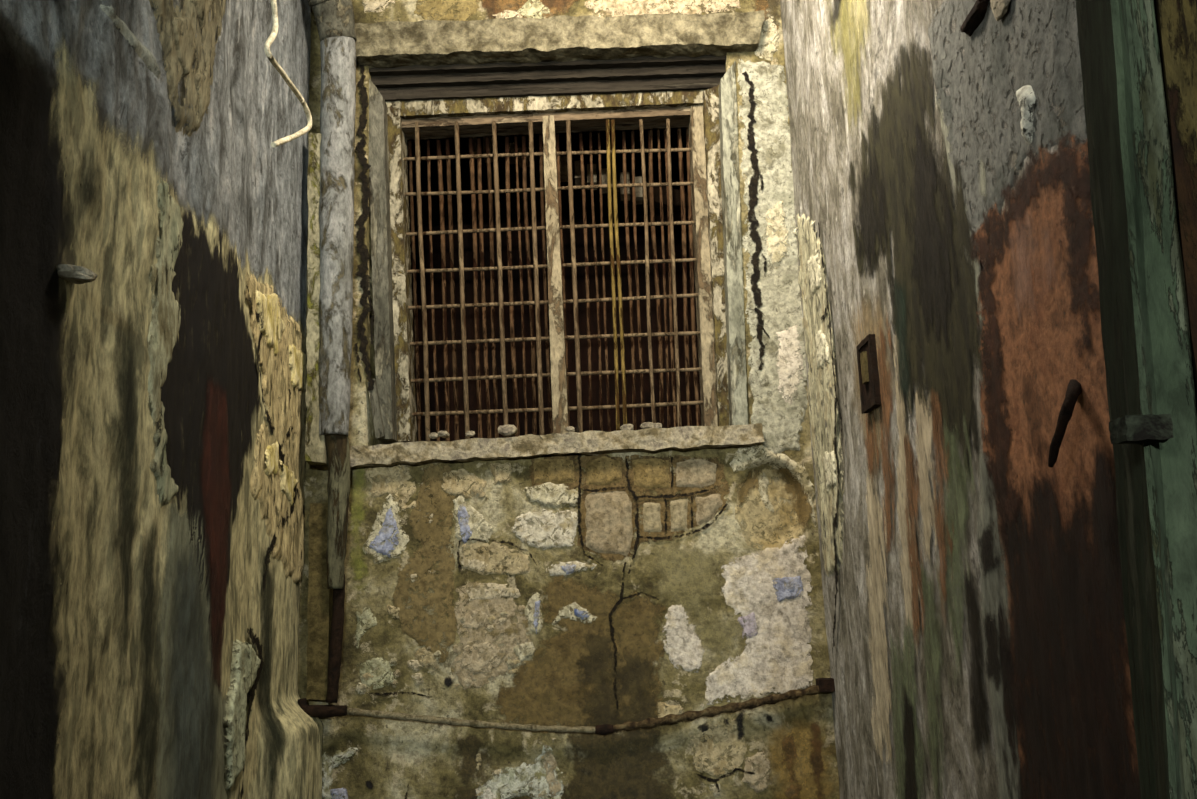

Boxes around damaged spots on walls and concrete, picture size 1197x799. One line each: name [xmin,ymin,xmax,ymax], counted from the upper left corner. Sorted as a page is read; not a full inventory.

flaking render [362,0,395,13]
flaking render [493,0,552,19]
flaking render [585,0,741,18]
crack [742,71,770,370]
flaking render [355,16,845,708]
rust [970,130,1141,799]
crack [540,425,728,709]
flaking render [657,701,684,718]
flaking render [475,738,564,799]
flaking render [689,719,772,796]